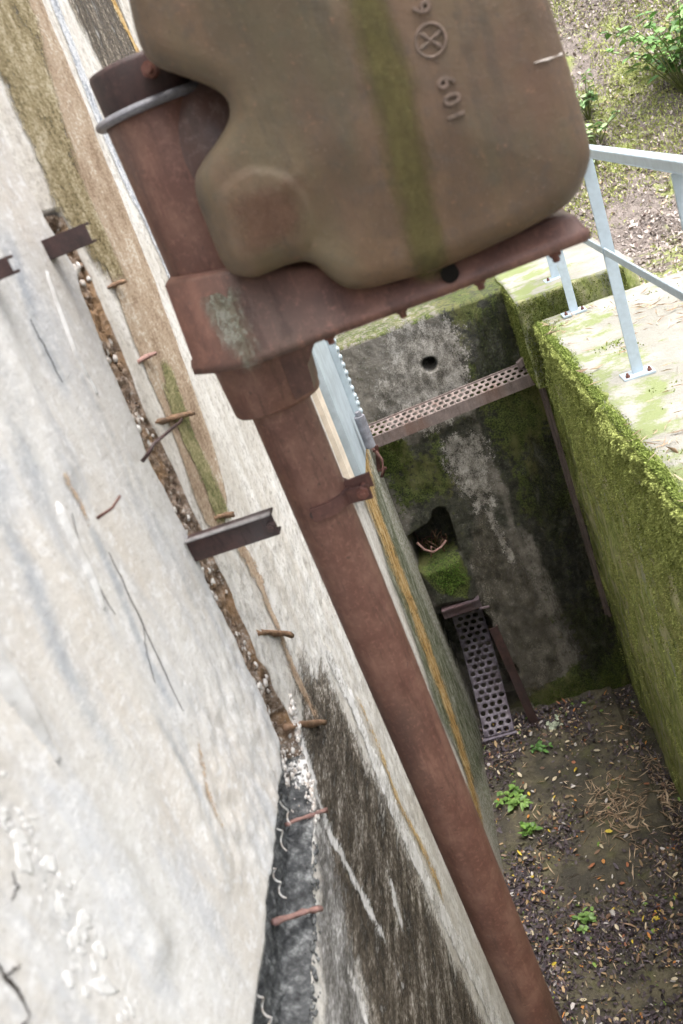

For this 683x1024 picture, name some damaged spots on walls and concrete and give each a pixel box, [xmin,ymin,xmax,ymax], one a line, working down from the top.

rust [28,0,227,527]
crack [100,553,183,710]
rust [238,546,318,718]
leakage [370,296,616,696]
leakage [281,650,502,1024]